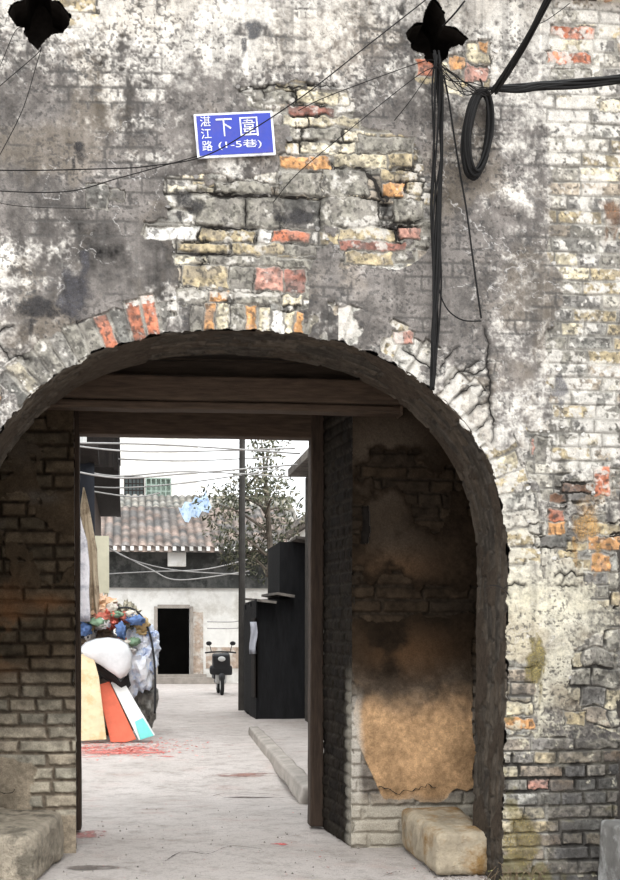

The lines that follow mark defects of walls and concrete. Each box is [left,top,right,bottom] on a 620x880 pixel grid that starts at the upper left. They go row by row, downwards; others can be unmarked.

leakage [242,21,261,53]
leakage [173,189,205,220]
spalling [141,80,436,300]
peeling [523,1,620,614]
crack [402,328,495,441]
leakage [525,635,545,683]